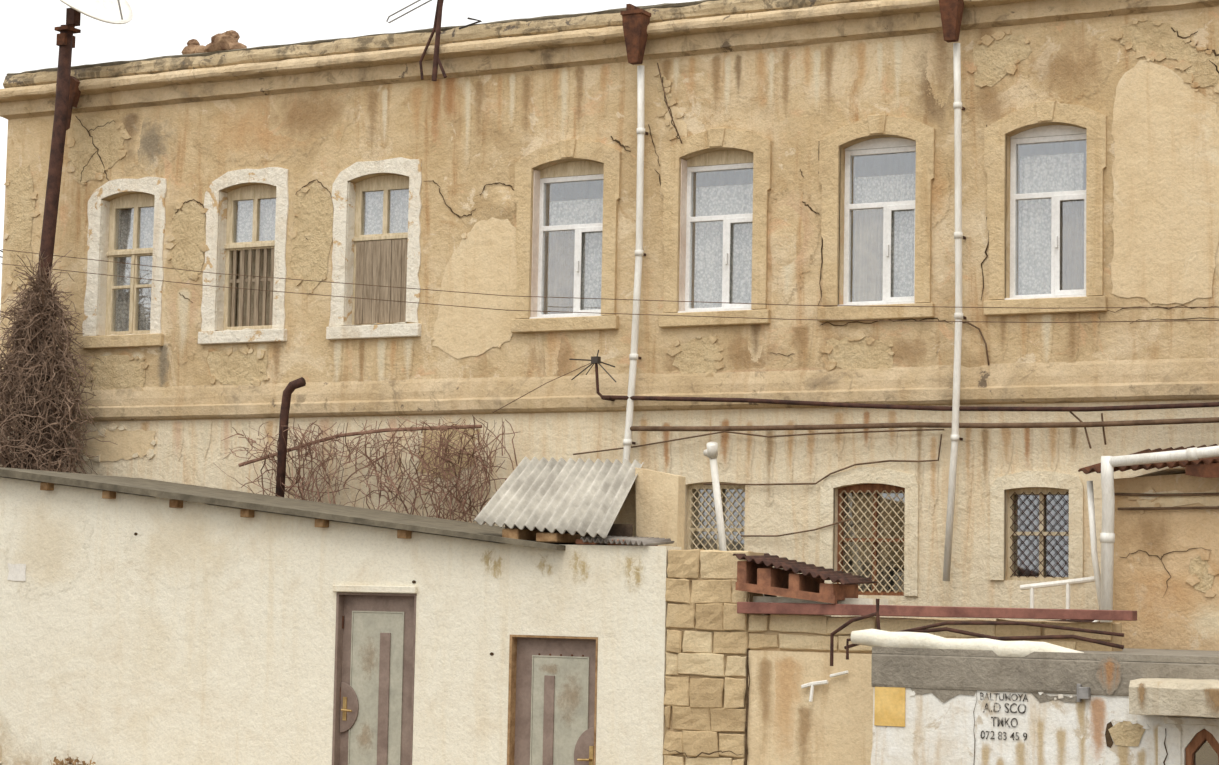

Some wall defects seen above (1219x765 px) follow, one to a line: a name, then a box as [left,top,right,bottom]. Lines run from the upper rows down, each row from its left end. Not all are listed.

crack [1171,27,1219,73]
crack [76,116,115,182]
water stain [463,72,535,170]
water stain [550,64,609,140]
peeling [1111,15,1219,304]
crack [423,180,514,218]
crack [1108,305,1218,323]
crack [1121,548,1212,595]
water stain [979,704,1163,765]